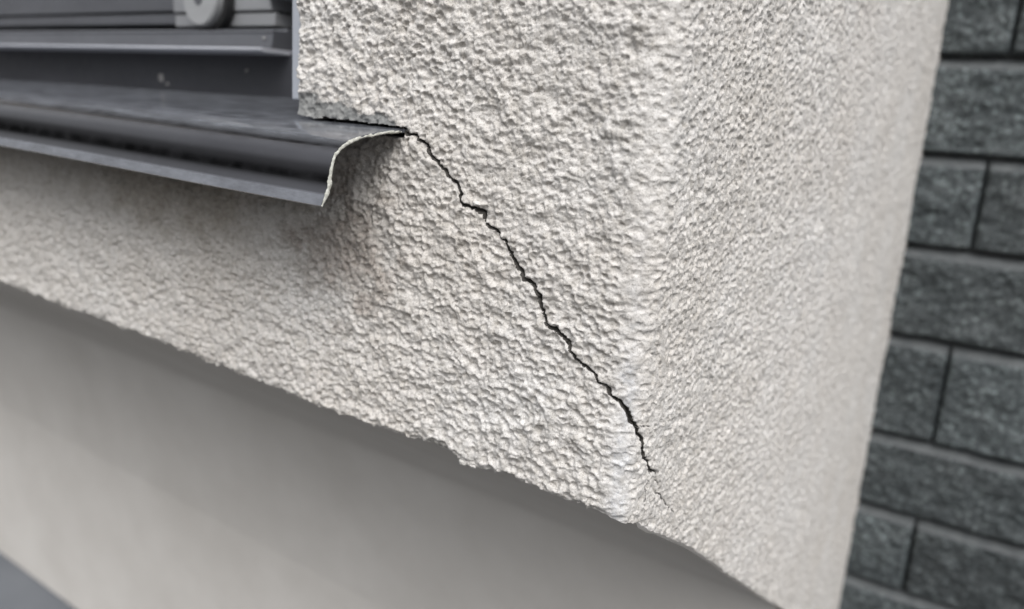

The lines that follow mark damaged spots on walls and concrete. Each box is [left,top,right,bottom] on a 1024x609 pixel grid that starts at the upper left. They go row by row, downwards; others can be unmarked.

crack [402,127,674,512]